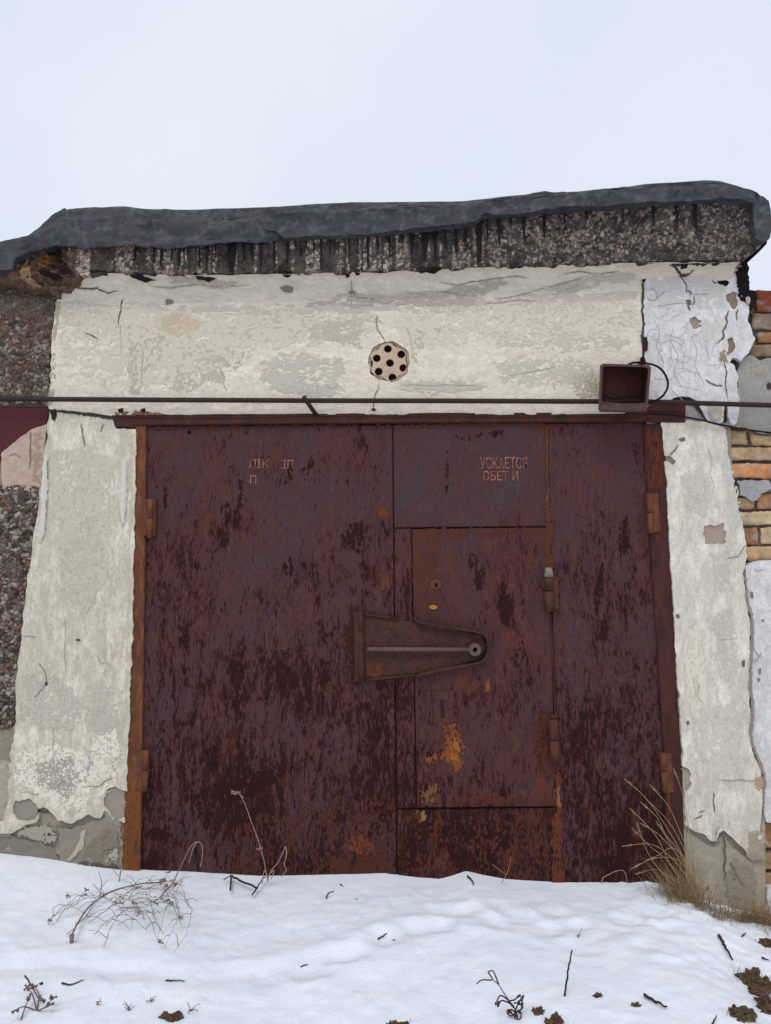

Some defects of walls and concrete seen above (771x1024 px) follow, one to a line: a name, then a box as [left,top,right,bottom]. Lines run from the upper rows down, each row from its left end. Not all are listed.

spalling [7,246,85,300]
crack [639,257,744,400]
spalling [717,338,734,363]
spalling [726,292,737,309]
corrosion [114,410,545,431]
corrosion [645,428,664,490]
corrosion [344,603,384,688]
peeling [18,668,85,731]
peeling [0,728,126,869]
corrosion [123,789,143,871]
corrosion [227,704,567,883]
spalling [685,830,768,912]